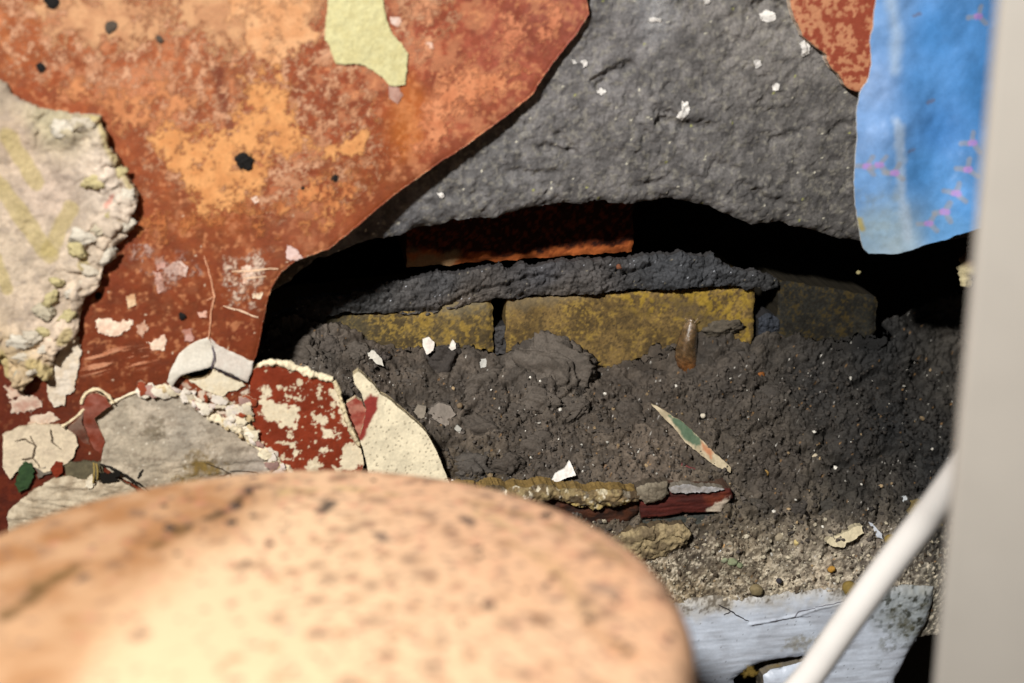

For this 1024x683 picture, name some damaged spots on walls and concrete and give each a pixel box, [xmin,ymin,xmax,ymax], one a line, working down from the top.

peeling [410,0,564,153]
peeling [0,0,462,493]
flaking render [551,460,576,482]
peeling [668,480,724,494]
flaking render [824,522,882,548]